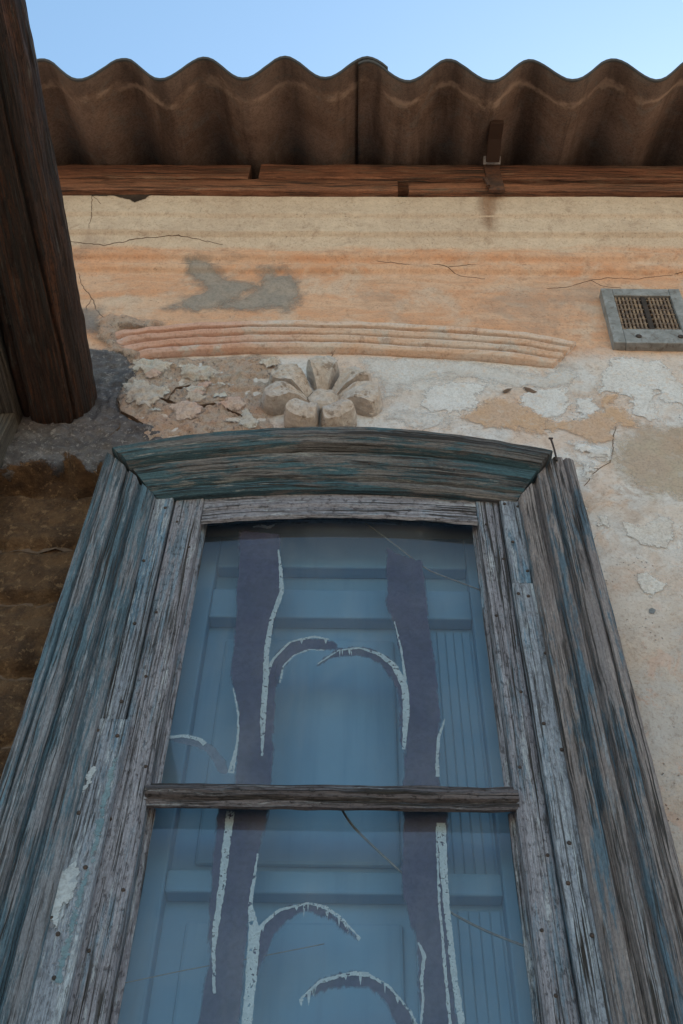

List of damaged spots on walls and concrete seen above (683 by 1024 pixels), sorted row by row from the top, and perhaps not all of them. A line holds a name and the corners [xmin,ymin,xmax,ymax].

crack [71,195,223,246]
crack [378,261,481,279]
crack [547,272,682,289]
flaking render [96,314,280,440]
peeling [362,357,683,496]
crack [583,428,616,486]